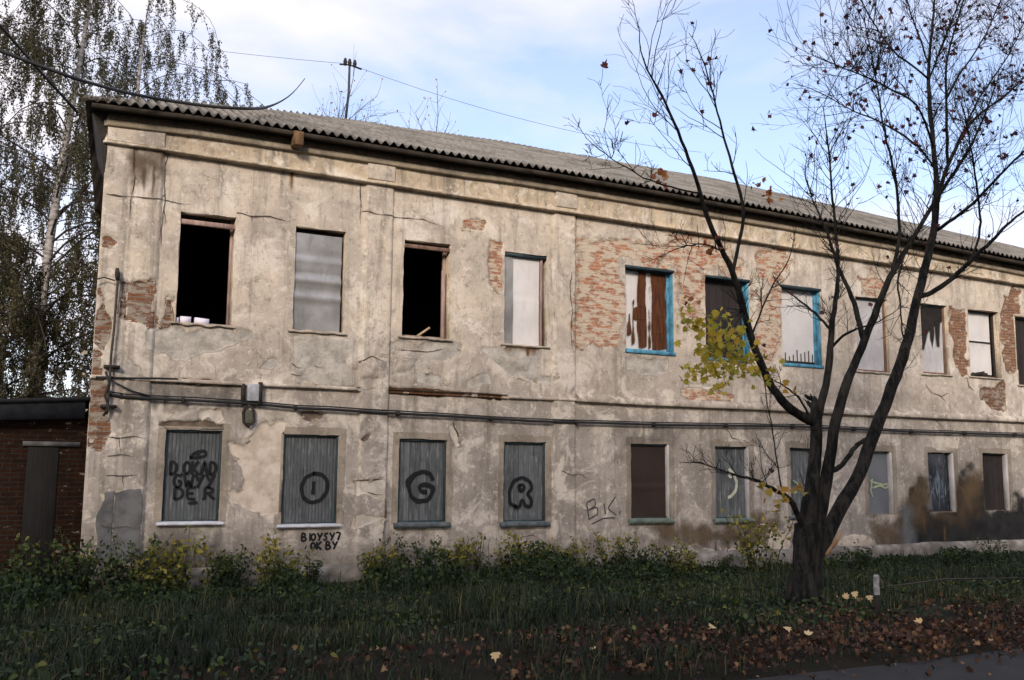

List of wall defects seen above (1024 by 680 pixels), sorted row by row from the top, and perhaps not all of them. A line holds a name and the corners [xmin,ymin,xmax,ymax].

crack [106,147,192,245]
flaking render [460,218,487,231]
flaking render [488,240,503,295]
flaking render [571,228,792,362]
peeling [79,279,253,451]
flaking render [948,286,1021,412]
peeling [227,420,286,516]
damp [874,463,1024,545]